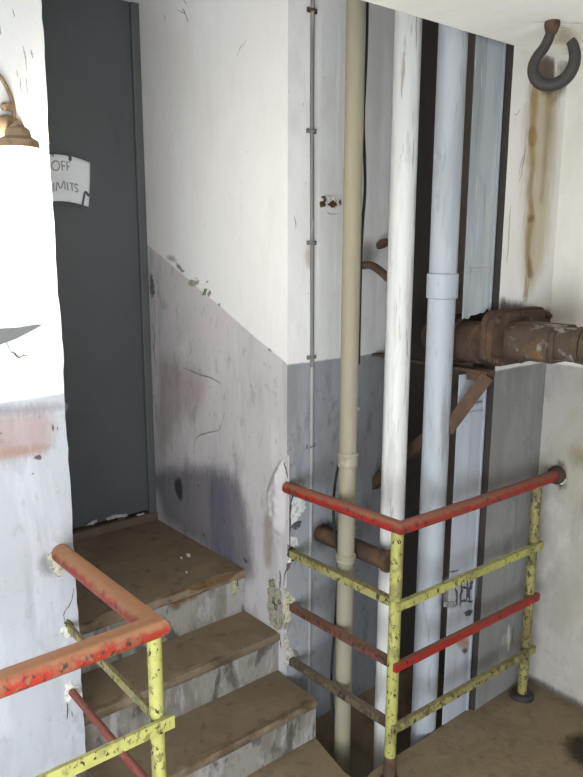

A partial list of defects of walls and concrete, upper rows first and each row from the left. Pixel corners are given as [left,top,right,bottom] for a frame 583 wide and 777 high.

rust [526,87,538,260]
spalling [188,277,211,297]
peeling [0,324,42,344]
spalling [266,578,299,666]